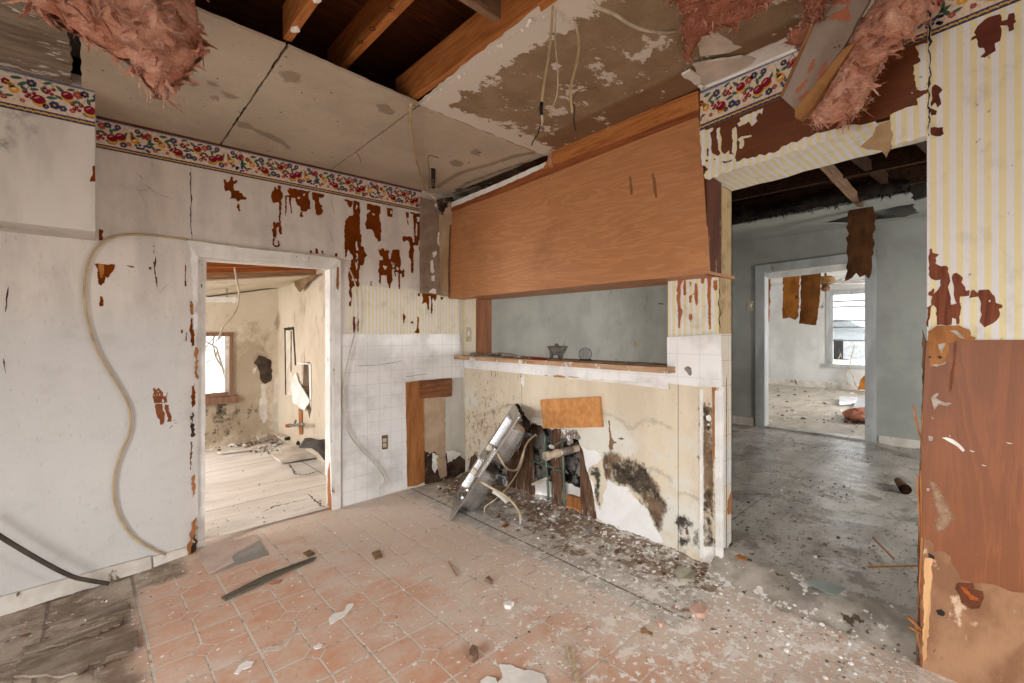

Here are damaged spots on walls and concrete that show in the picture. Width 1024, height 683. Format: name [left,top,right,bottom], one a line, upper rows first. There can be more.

peeling [971,13,1016,58]
peeling [224,177,247,211]
peeling [271,185,324,247]
peeling [95,263,134,306]
peeling [310,199,420,332]
peeling [676,278,718,329]
peeling [926,249,1002,367]
spalling [181,301,199,497]
flaking render [253,355,278,431]
damp [589,402,715,562]